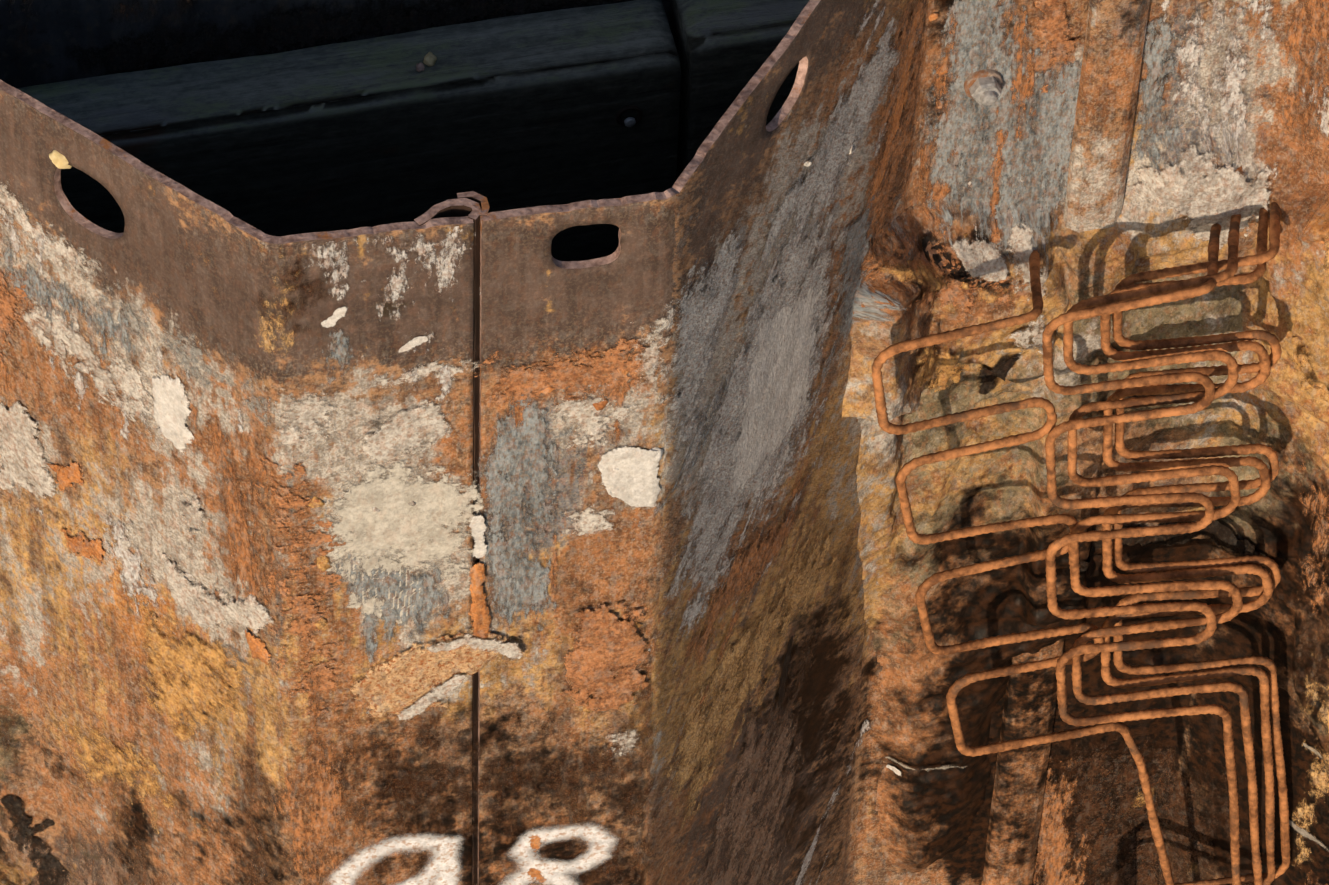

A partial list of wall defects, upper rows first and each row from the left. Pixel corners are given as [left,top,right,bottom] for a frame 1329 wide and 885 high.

rust [845,0,1016,322]
rust [989,0,1079,256]
spalling [1132,18,1277,250]
rust [1281,0,1329,170]
peeling [0,402,58,521]
peeling [152,375,194,454]
spalling [913,334,1020,395]
peeling [161,554,274,633]
rust [187,390,363,885]
peeling [336,554,450,664]
rust [527,868,547,883]
leakage [1049,735,1249,885]